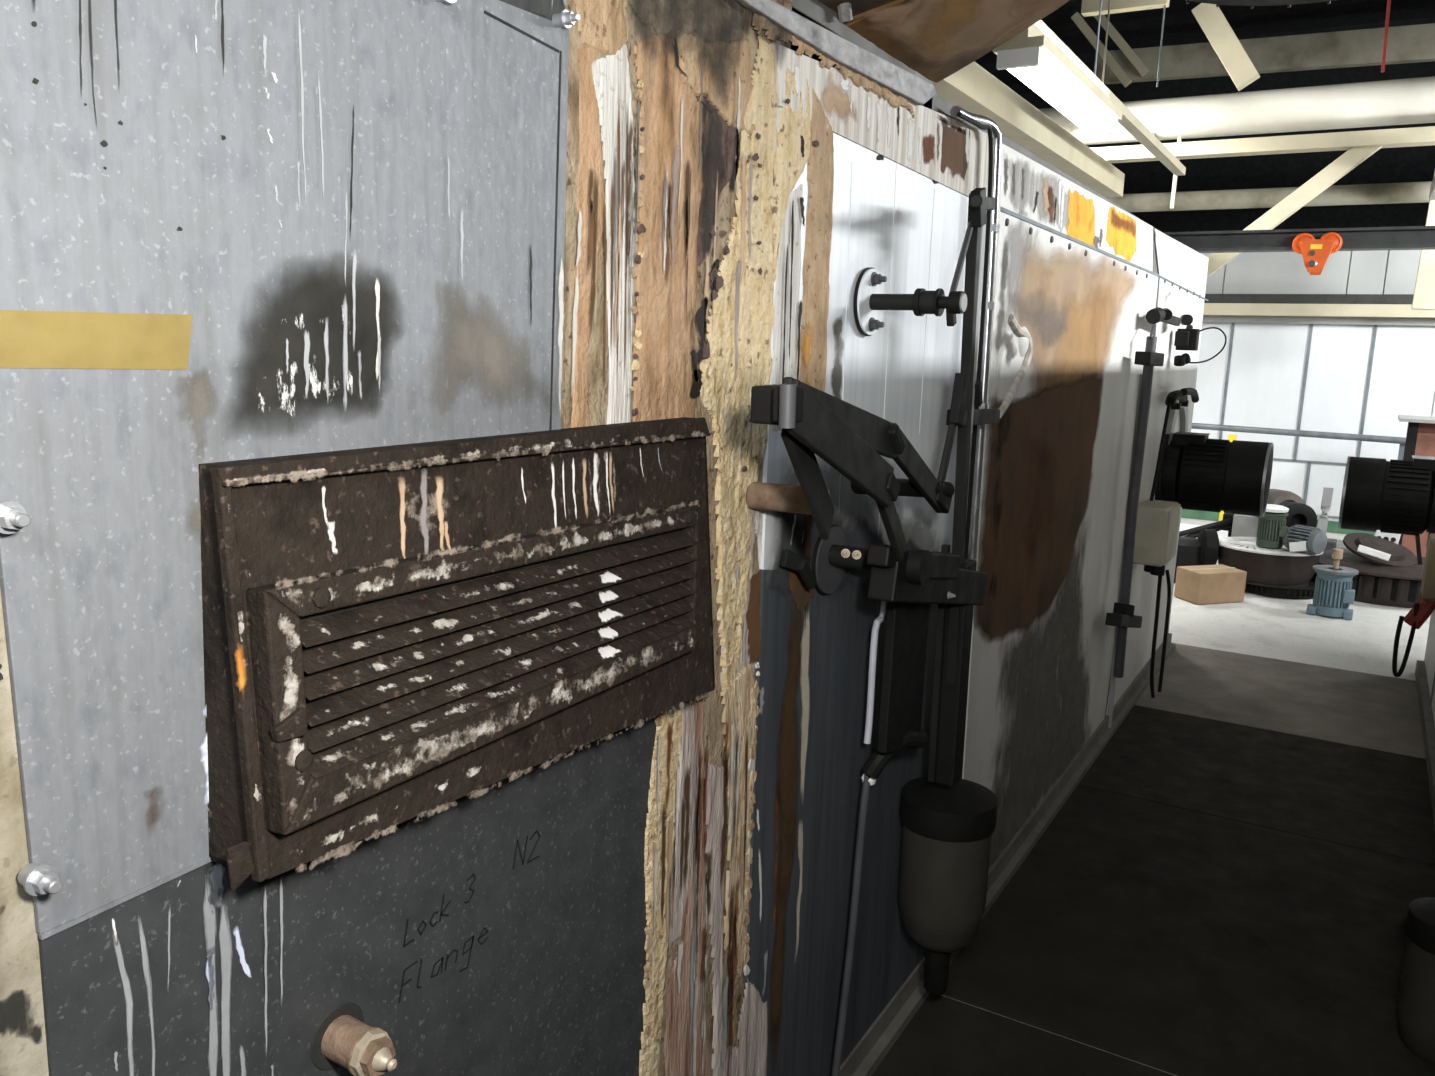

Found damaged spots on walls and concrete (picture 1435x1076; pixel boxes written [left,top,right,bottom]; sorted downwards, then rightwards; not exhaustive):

leakage [263,35,278,99]
leakage [298,18,324,205]
leakage [286,108,381,408]
leakage [447,158,464,279]
peeling [226,468,353,486]
peeling [287,737,304,765]
peeling [276,572,341,719]
peeling [346,616,658,789]
peeling [468,565,581,651]
peeling [357,500,698,592]
peeling [607,32,834,1076]
peeling [298,814,396,871]